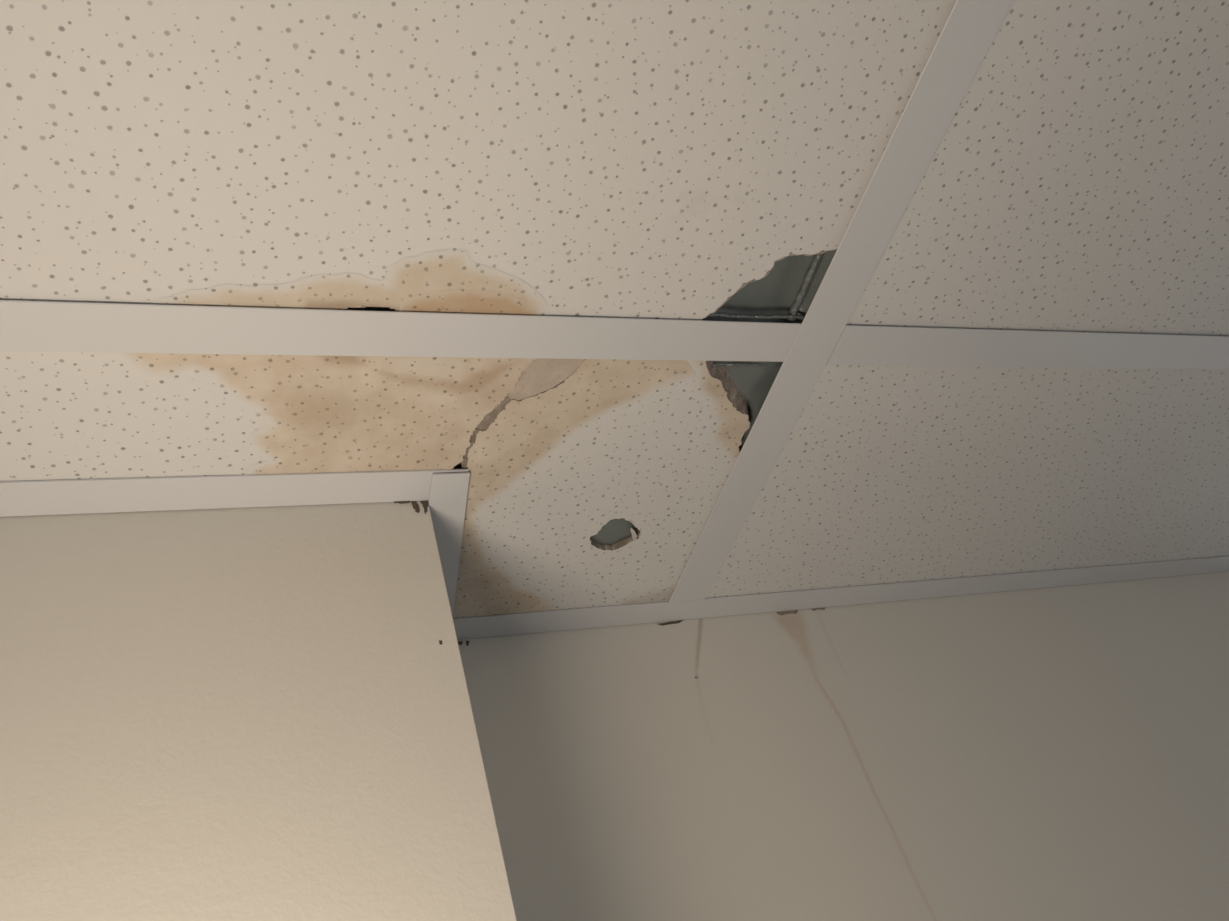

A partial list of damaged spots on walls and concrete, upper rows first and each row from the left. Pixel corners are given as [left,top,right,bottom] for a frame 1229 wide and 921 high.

leakage [150,249,551,316]
spalling [706,361,749,420]
leakage [118,353,750,619]